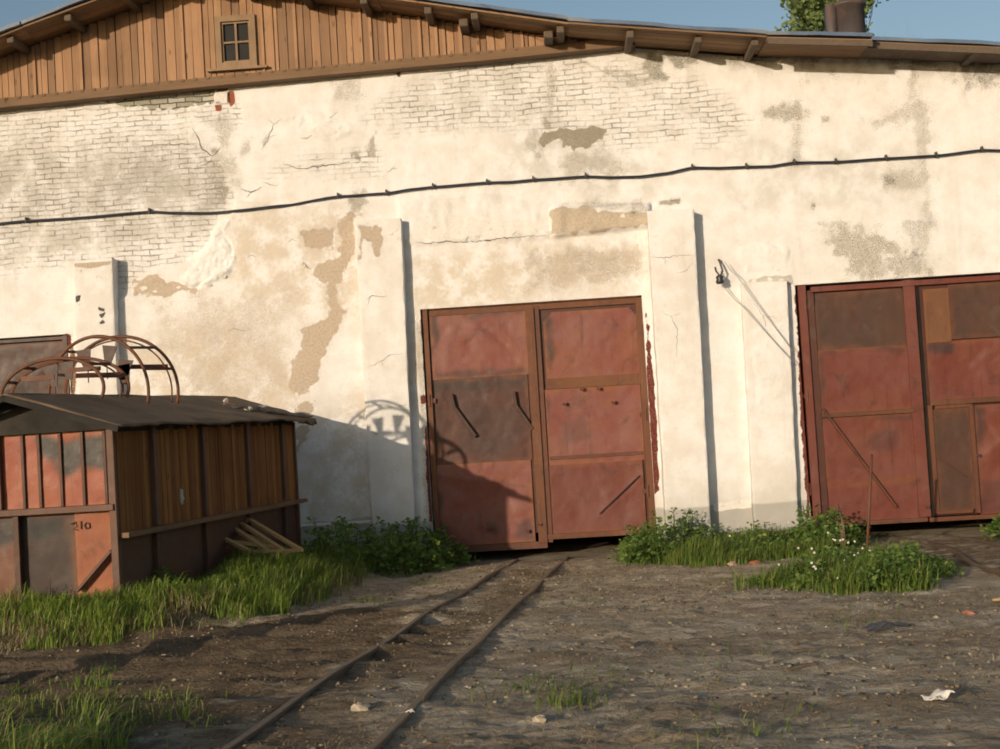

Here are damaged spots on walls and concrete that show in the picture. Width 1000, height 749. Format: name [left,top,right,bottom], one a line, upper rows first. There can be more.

peeling [132,211,401,452]
crack [242,162,346,198]
peeling [517,205,649,299]
water stain [805,68,952,281]